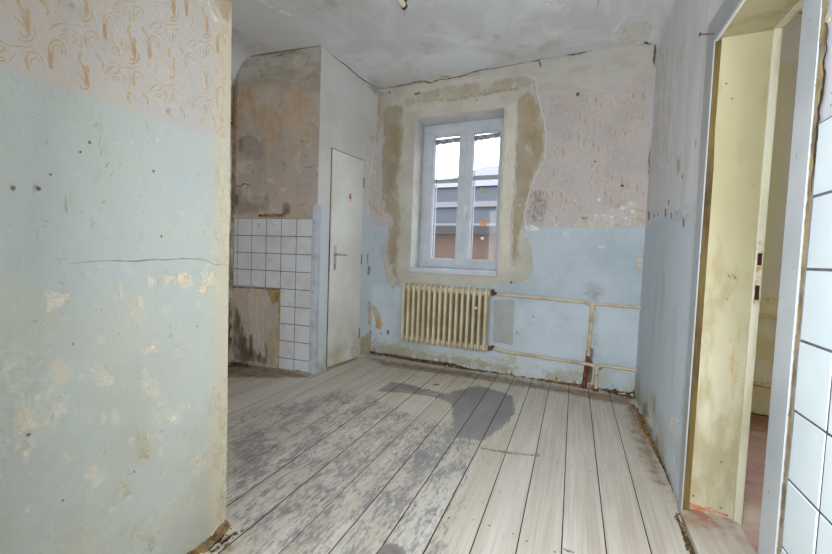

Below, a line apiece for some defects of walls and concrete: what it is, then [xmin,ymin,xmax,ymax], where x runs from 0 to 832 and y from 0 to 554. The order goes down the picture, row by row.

peeling [380,73,547,287]
crack [73,258,227,266]
water stain [228,299,279,364]
rust [586,348,602,383]